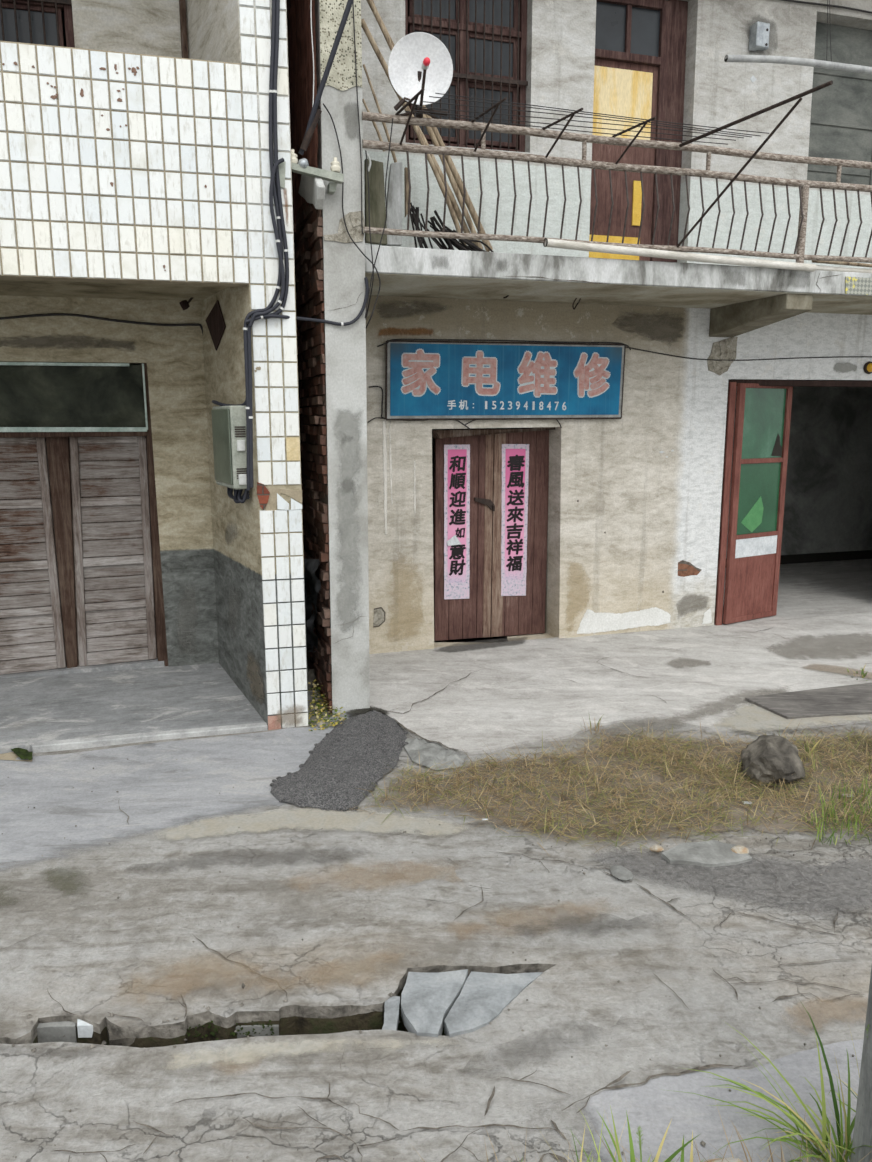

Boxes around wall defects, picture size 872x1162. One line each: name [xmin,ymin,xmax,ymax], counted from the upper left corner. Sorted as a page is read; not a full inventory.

flaking render [707,337,738,375]
spalling [257,482,302,511]
flaking render [678,560,701,577]
peeling [577,607,671,634]
crack [194,936,287,997]
crack [712,905,864,1002]
crack [172,1047,748,1162]
crack [54,1120,174,1162]